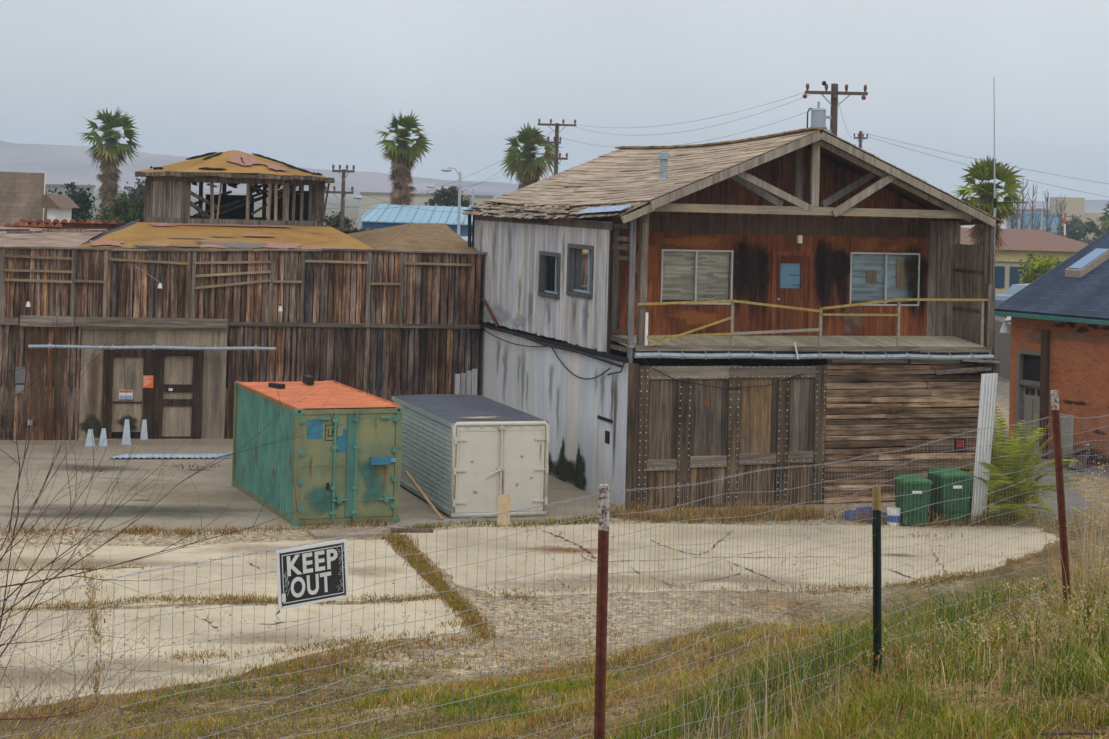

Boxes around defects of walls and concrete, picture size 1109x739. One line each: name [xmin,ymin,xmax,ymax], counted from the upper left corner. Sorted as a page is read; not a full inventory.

spalling [1054,322,1109,333]
crack [542,530,785,587]